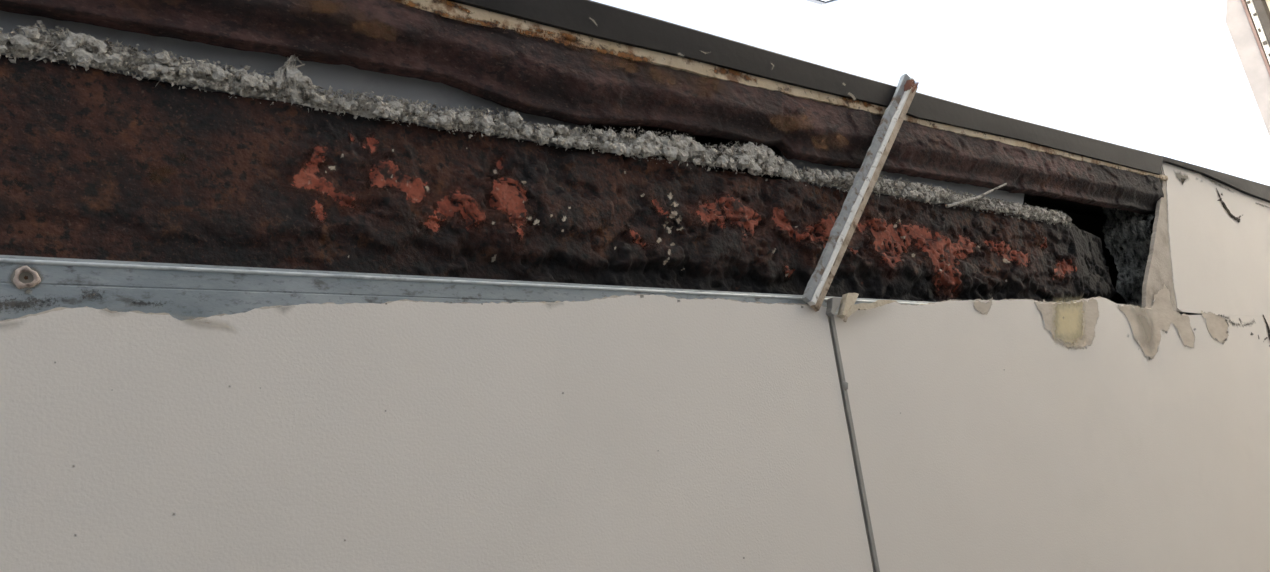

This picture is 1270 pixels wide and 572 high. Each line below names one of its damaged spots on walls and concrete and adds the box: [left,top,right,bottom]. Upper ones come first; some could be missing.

corrosion [390,0,757,97]
corrosion [904,79,919,93]
corrosion [0,267,66,313]
peeling [1034,299,1099,349]
peeling [1118,283,1229,360]